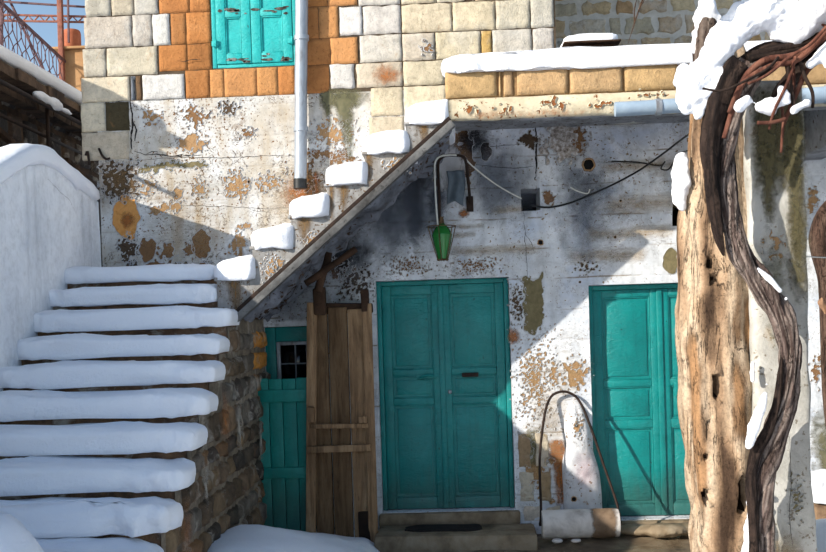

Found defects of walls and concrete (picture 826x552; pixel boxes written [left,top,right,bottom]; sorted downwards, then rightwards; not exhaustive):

flaking render [97,97,258,266]
crack [130,101,294,161]
peeling [219,111,362,204]
peeling [296,231,318,247]
damp [381,145,465,241]
damp [478,152,519,213]
peeling [325,251,595,506]